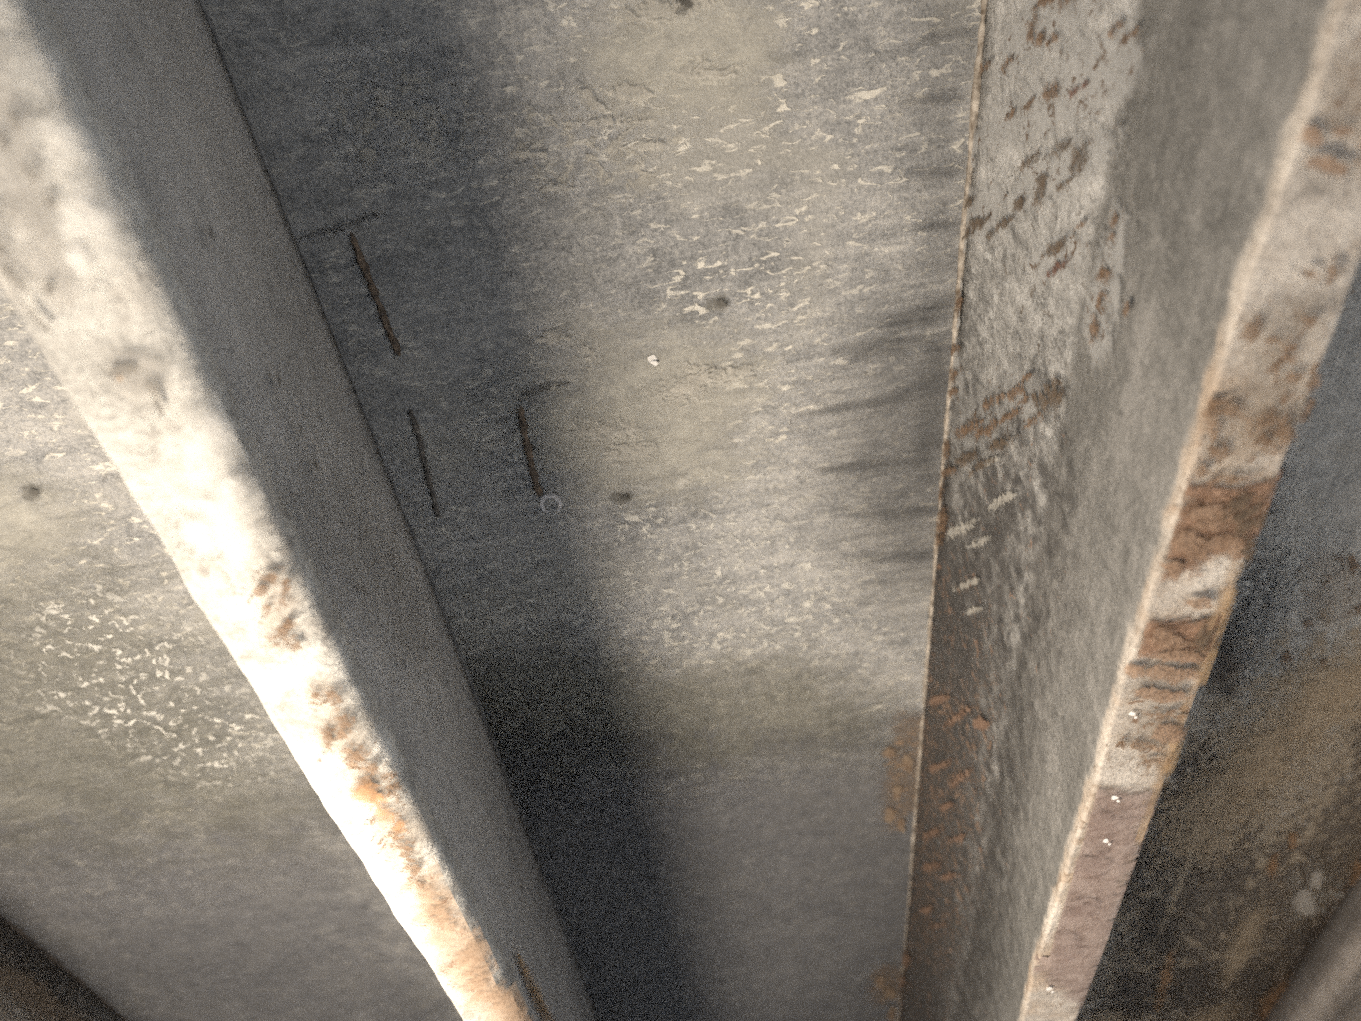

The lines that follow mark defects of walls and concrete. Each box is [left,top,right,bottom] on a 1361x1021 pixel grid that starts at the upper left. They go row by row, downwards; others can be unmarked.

corrosion [962,0,1154,252]
corrosion [936,276,1065,547]
corrosion [1025,198,1133,364]
corrosion [1161,255,1350,582]
corrosion [239,567,303,651]
corrosion [307,680,552,1021]
corrosion [1033,544,1361,1021]